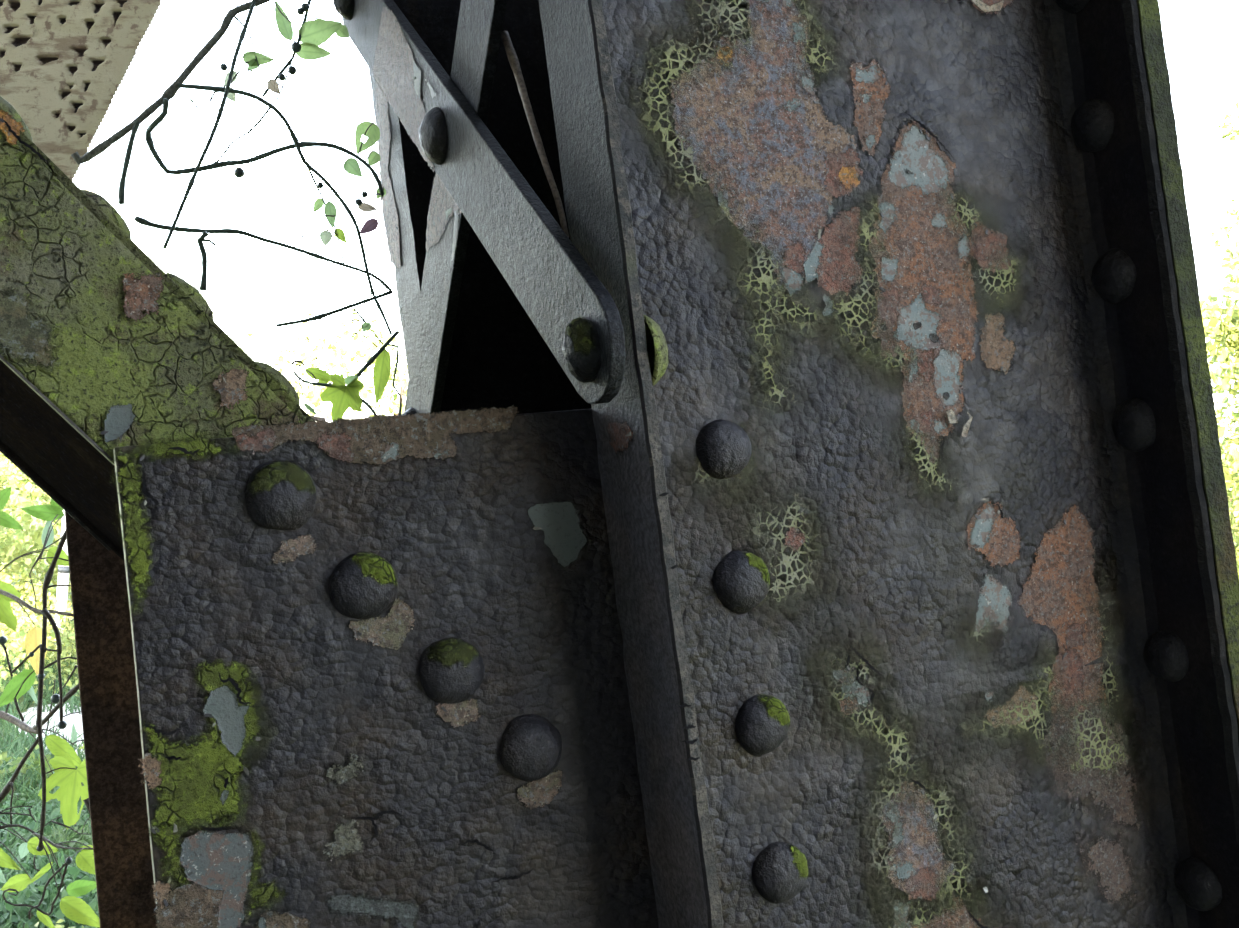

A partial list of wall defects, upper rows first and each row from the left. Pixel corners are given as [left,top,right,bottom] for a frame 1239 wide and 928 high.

rust [971,0,1013,15]
crack [2,117,48,163]
peeling [373,6,462,268]
rust [965,216,1023,375]
peeling [528,501,587,568]
peeling [203,685,249,757]
rust [1017,504,1142,908]
peeling [138,753,164,790]
peeling [151,830,254,928]